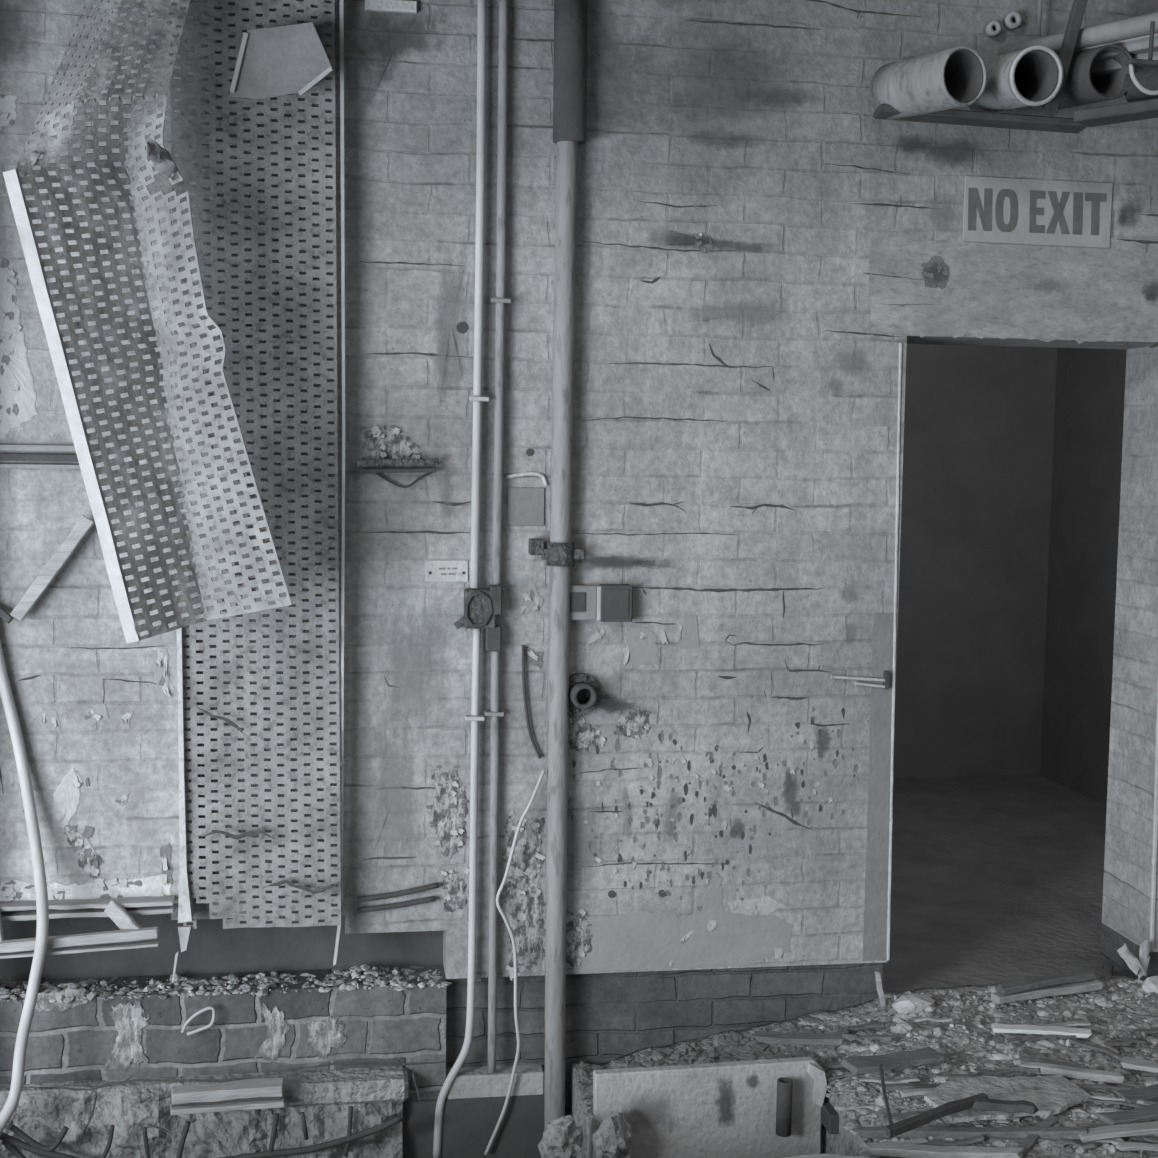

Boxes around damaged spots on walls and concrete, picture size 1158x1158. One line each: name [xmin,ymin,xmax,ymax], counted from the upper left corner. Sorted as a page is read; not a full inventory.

crack [684,0,921,30]
crack [609,344,774,391]
peeling [0,767,173,901]
spalling [425,765,468,856]
spalling [568,707,858,917]
crack [756,803,810,829]
spalling [440,868,469,912]
spalling [500,811,546,981]
spalling [566,908,593,969]